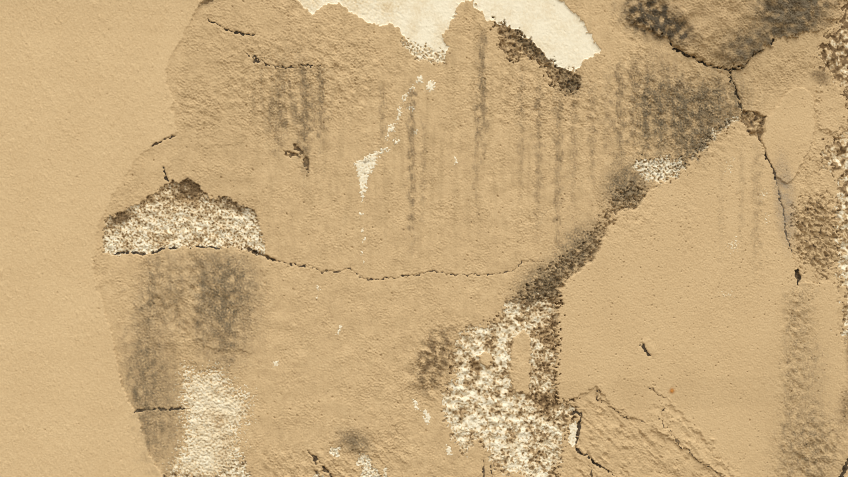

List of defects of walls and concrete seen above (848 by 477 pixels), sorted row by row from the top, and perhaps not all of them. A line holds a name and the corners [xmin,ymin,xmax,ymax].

spalling [298,0,601,96]
spalling [814,0,848,109]
crack [114,246,220,256]
spalling [102,178,265,257]
leakage [196,258,244,332]
crack [246,247,522,281]
spalling [440,110,766,477]
crack [760,142,792,252]
spalling [788,119,848,344]
spalling [162,360,258,477]
crack [571,388,721,477]
crack [838,458,848,477]